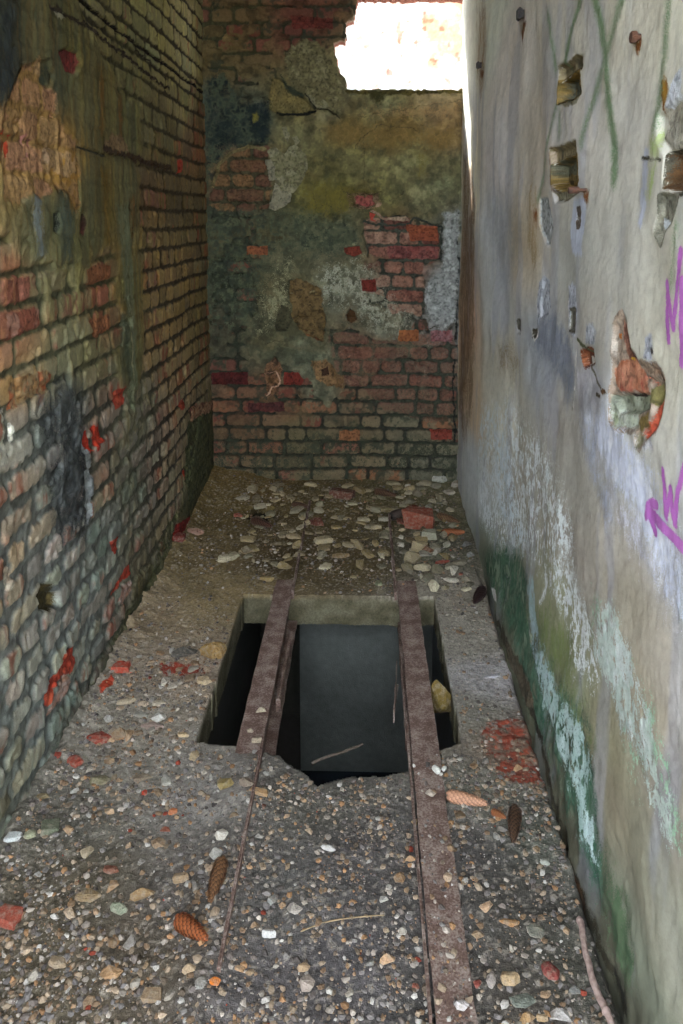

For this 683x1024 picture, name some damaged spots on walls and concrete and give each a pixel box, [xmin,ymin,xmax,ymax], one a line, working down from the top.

flaking render [0,57,82,215]
flaking render [208,73,317,212]
flaking render [344,192,443,342]
water stain [475,0,487,97]
spalling [539,139,586,257]
spalling [556,54,583,107]
flaking render [637,67,683,248]
flaking render [248,356,344,413]
flaking render [568,281,666,455]
water stain [203,71,683,856]
corrosion [276,630,292,712]
corrosion [393,654,409,751]